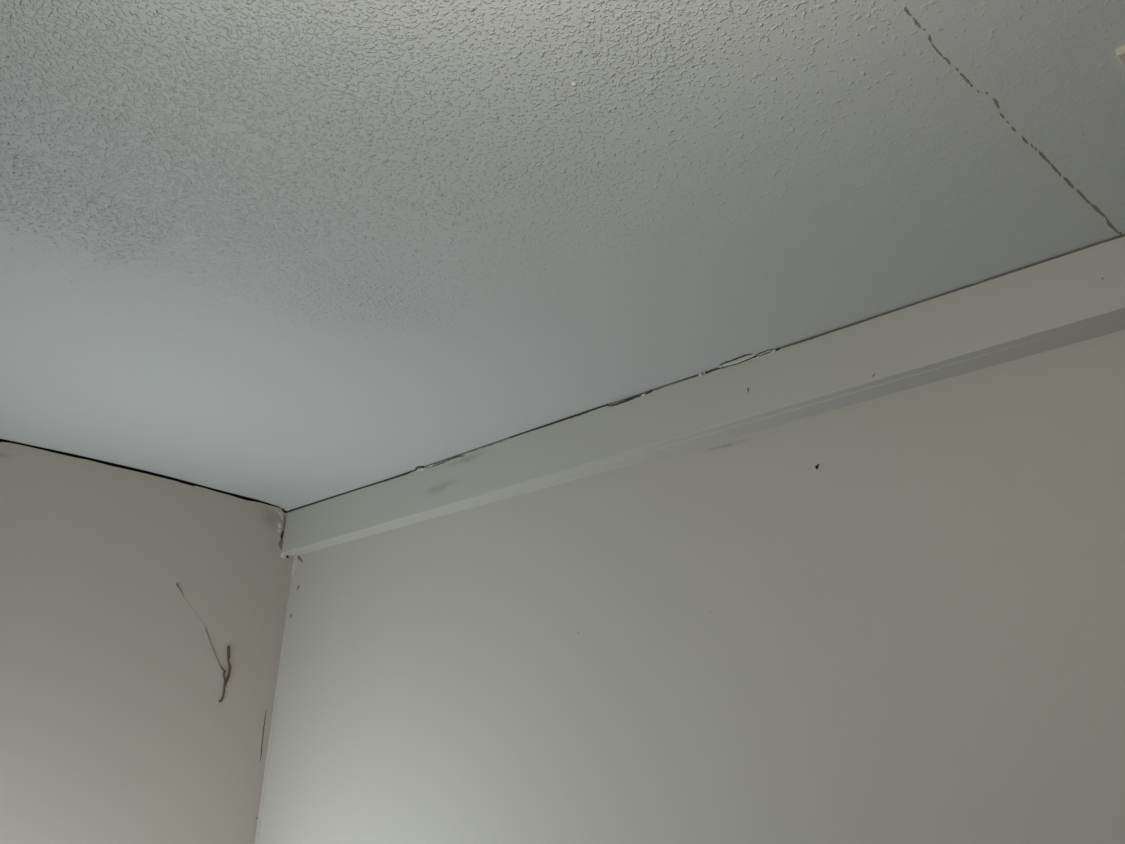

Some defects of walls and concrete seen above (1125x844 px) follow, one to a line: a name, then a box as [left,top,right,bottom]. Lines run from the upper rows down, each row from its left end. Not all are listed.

crack [276,7,1125,562]